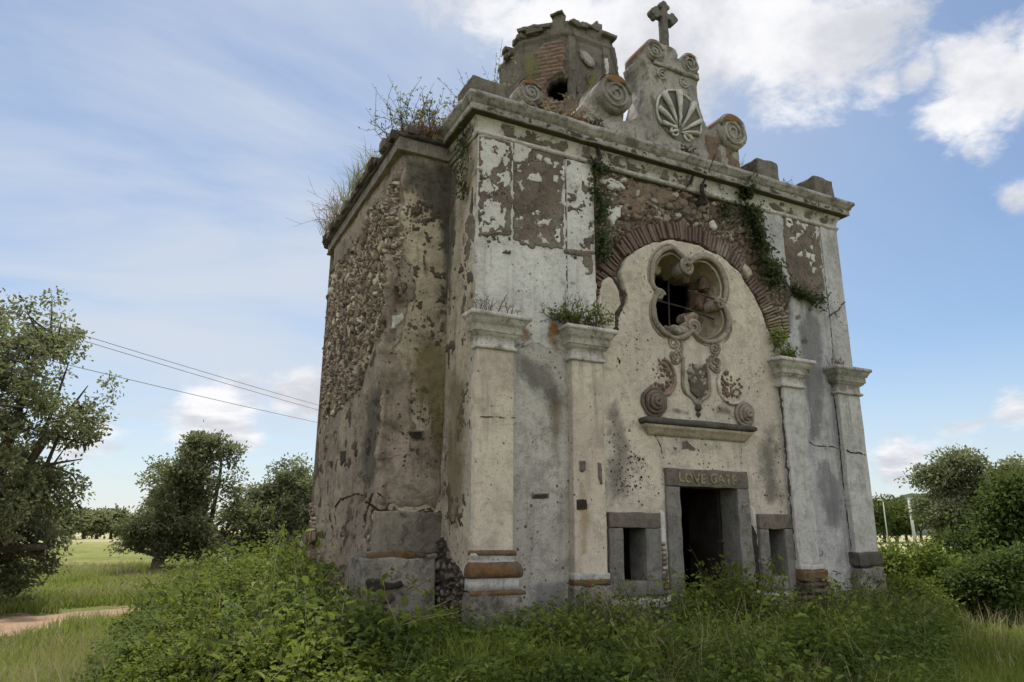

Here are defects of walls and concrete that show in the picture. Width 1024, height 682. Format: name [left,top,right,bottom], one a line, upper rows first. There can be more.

flaking render [305,124,828,565]
crack [335,492,463,528]
crack [778,387,865,560]